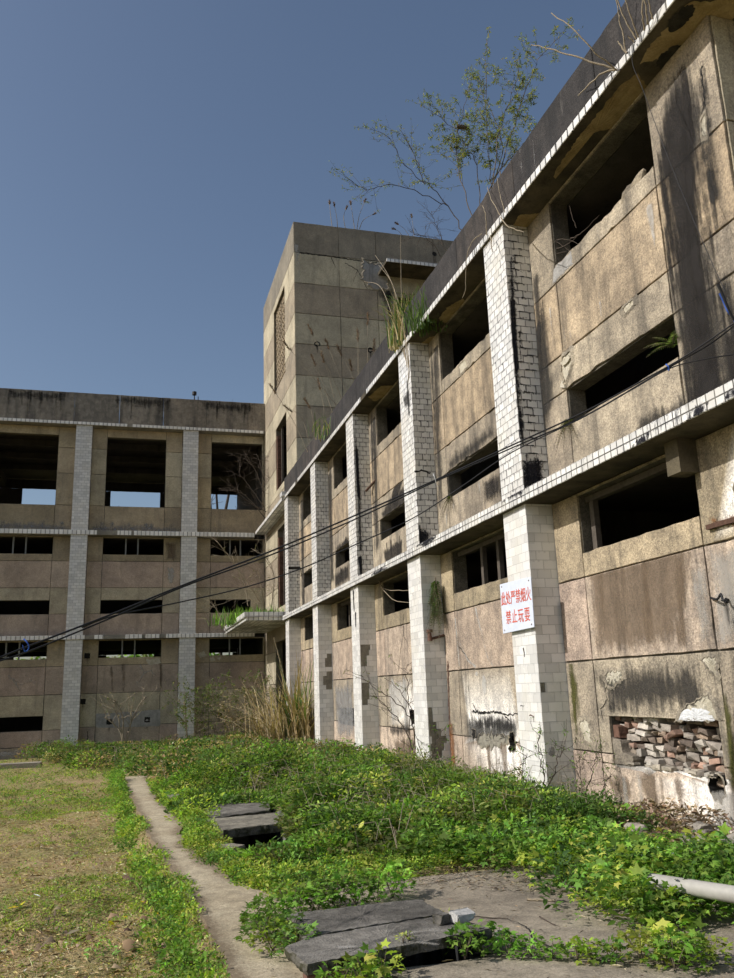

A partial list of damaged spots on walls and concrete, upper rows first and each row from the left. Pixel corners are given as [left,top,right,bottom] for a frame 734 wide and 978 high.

water stain [632,67,734,447]
water stain [479,240,552,503]
water stain [8,390,65,401]
water stain [117,397,170,409]
water stain [205,402,250,419]
peeling [323,654,332,689]
peeling [361,645,370,666]
crack [447,647,534,761]
water stain [600,668,700,710]
peeling [428,708,447,763]
water stain [468,718,516,775]
spalling [612,737,645,766]